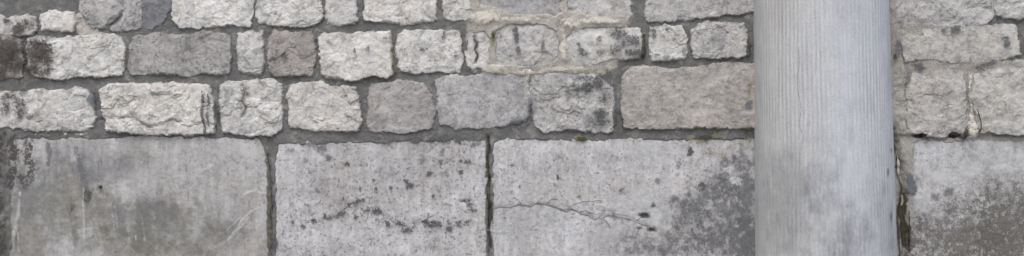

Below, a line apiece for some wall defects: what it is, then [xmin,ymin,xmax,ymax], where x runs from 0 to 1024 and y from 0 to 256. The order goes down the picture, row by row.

leakage [0,134,52,254]
crack [291,197,654,234]